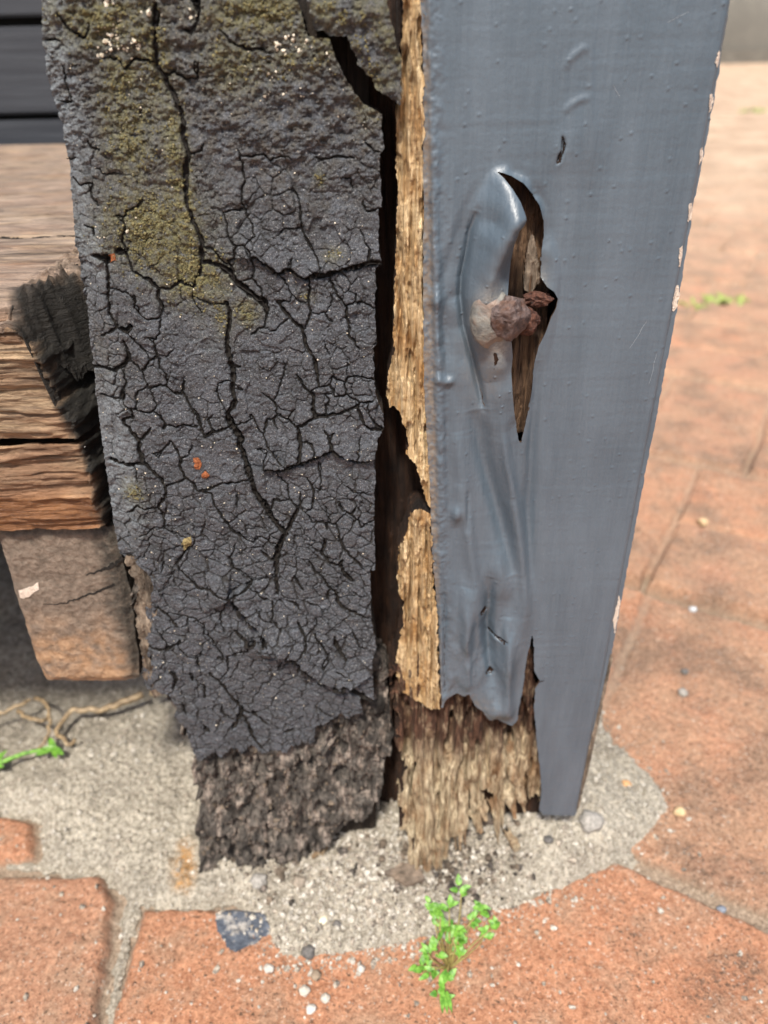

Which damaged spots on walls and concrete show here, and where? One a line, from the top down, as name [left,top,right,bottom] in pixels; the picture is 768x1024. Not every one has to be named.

crack [48,14,90,41]
corrosion [193,457,209,478]
crack [66,0,383,751]
spalling [498,172,550,433]